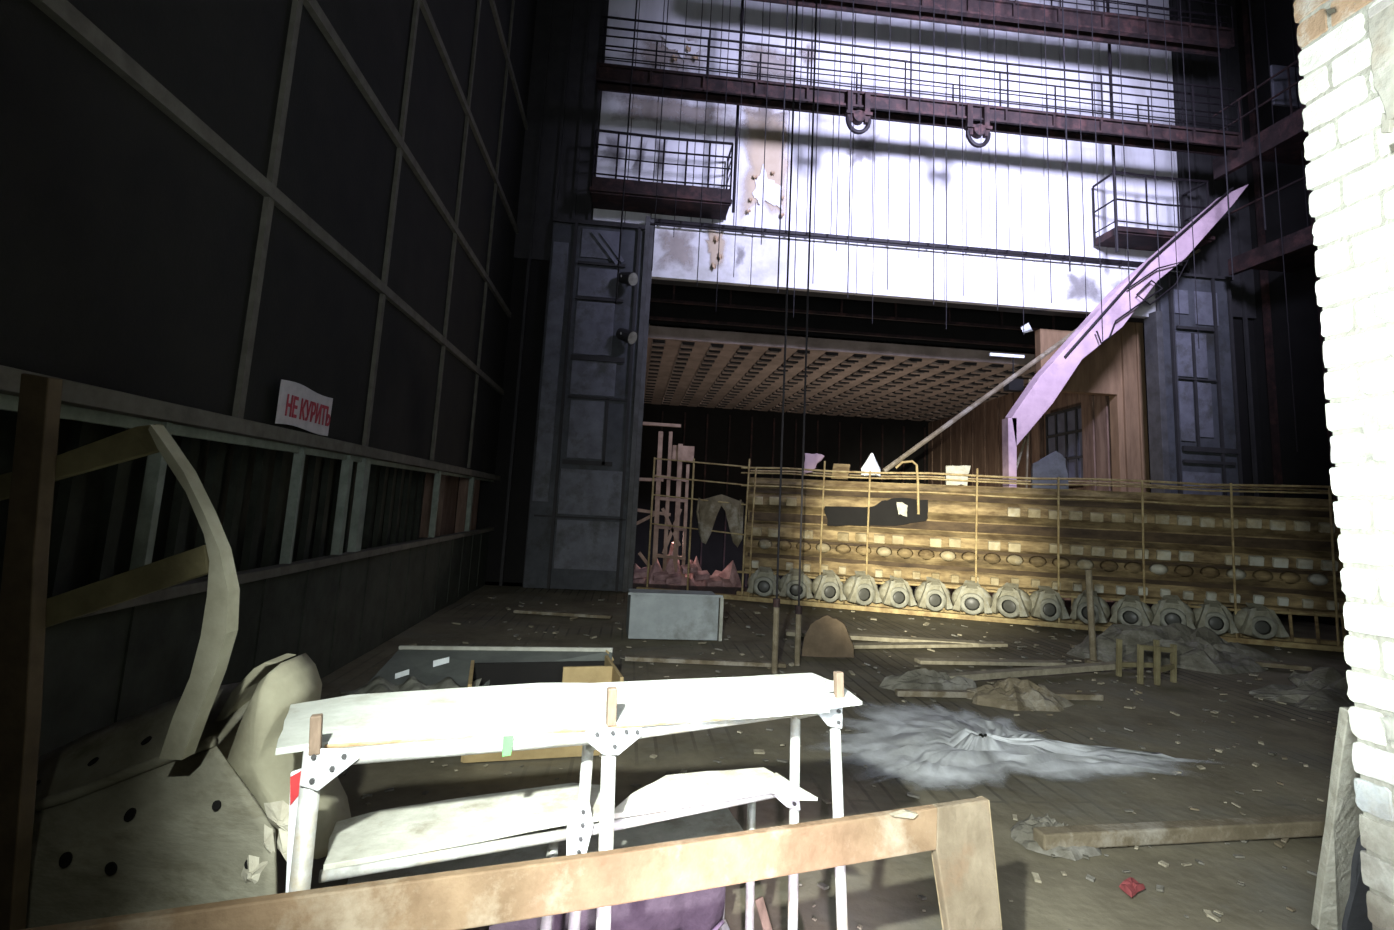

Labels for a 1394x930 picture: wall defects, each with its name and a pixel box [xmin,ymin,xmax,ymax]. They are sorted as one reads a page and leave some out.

flaking render [1367,0,1394,153]
peeling [745,114,787,217]
peeling [663,232,691,264]
peeling [706,230,725,269]